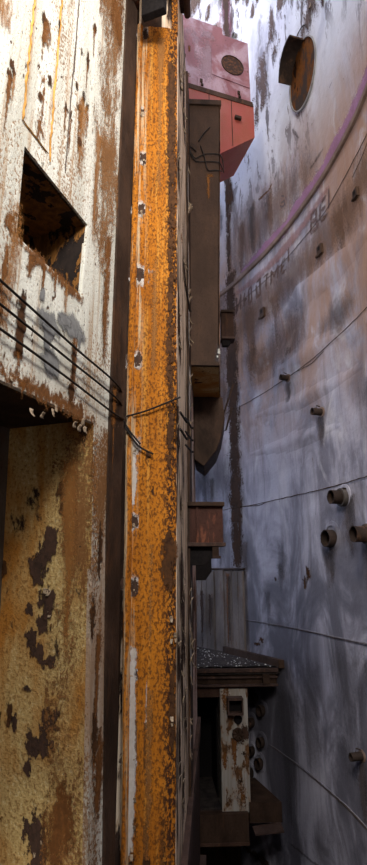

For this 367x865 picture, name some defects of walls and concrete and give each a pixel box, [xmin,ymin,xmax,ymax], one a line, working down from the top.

rust [0,0,13,32]
rust [4,57,16,128]
rust [36,72,52,144]
rust [41,11,52,58]
peeling [183,0,218,26]
peeling [252,0,283,130]
peeling [297,0,324,38]
rust [64,0,126,364]
rust [151,37,183,476]
damp [220,158,367,647]
rust [0,204,117,865]
rust [149,527,178,640]